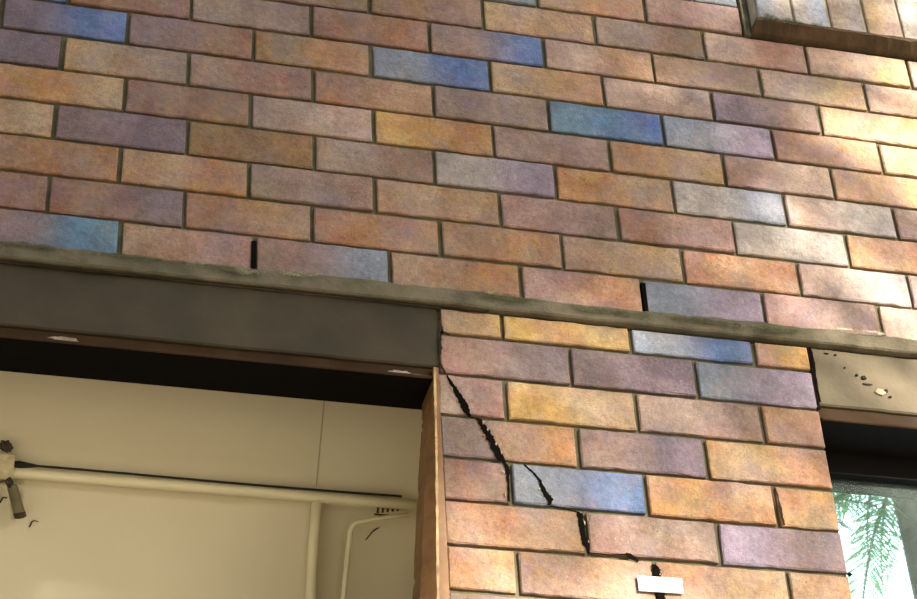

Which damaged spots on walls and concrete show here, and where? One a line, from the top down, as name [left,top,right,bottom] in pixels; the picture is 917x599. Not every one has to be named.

crack [0,259,666,599]